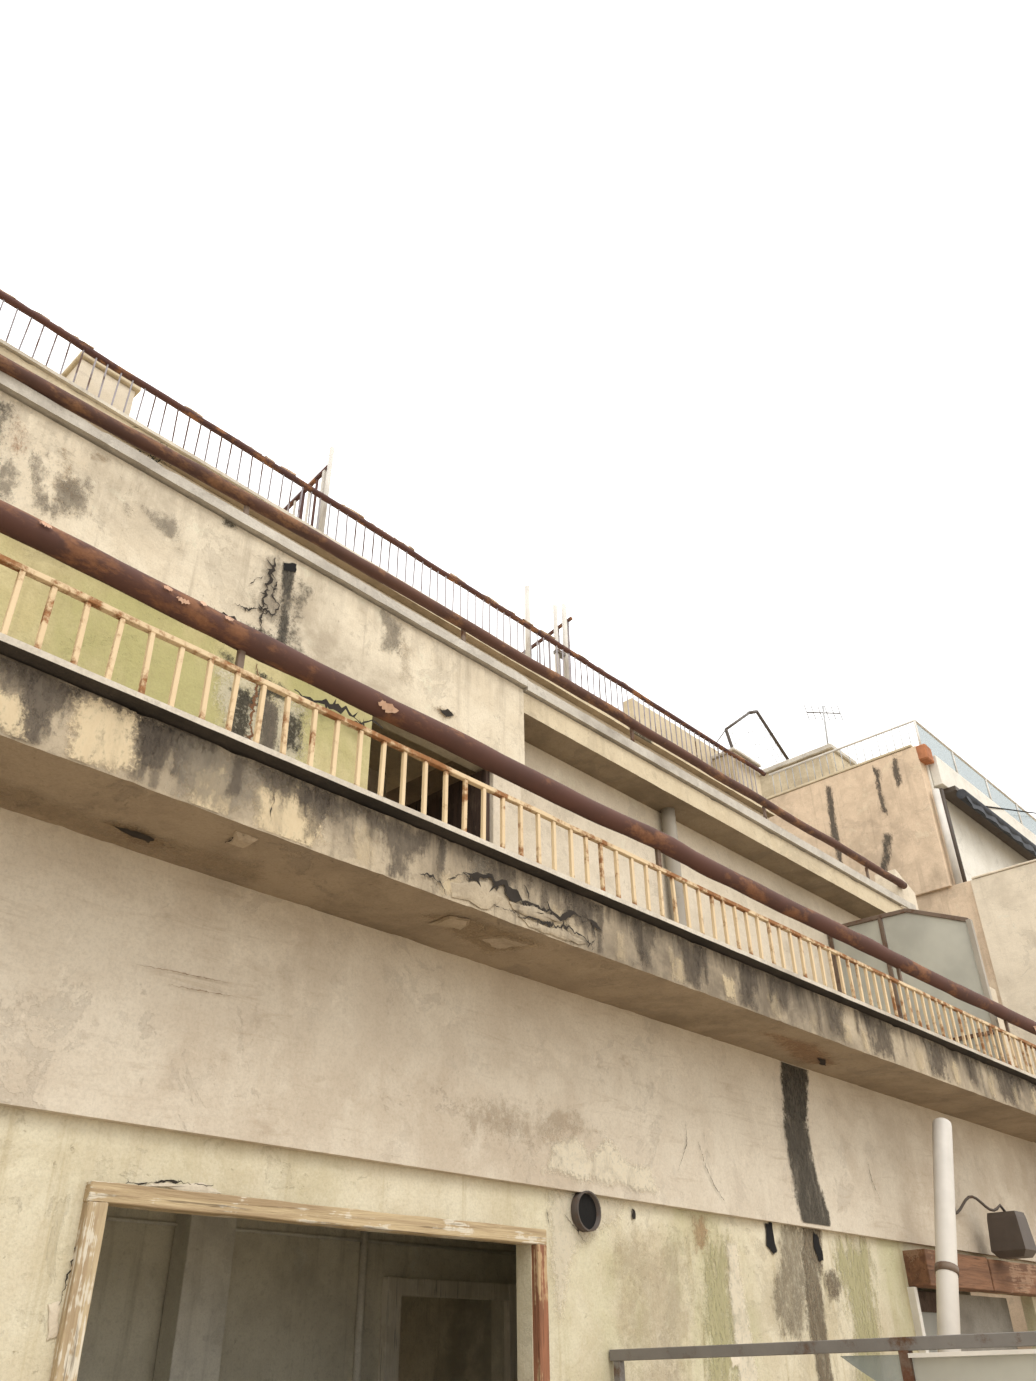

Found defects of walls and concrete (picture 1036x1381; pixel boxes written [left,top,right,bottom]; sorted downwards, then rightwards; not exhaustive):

water stain [0,453,90,514]
crack [214,558,280,632]
water stain [0,657,78,744]
water stain [217,652,307,759]
water stain [135,722,454,892]
water stain [826,786,842,862]
water stain [881,834,891,870]
water stain [872,758,902,815]
crack [421,872,602,950]
water stain [680,941,789,1011]
water stain [926,1040,1034,1104]
water stain [774,1062,842,1381]